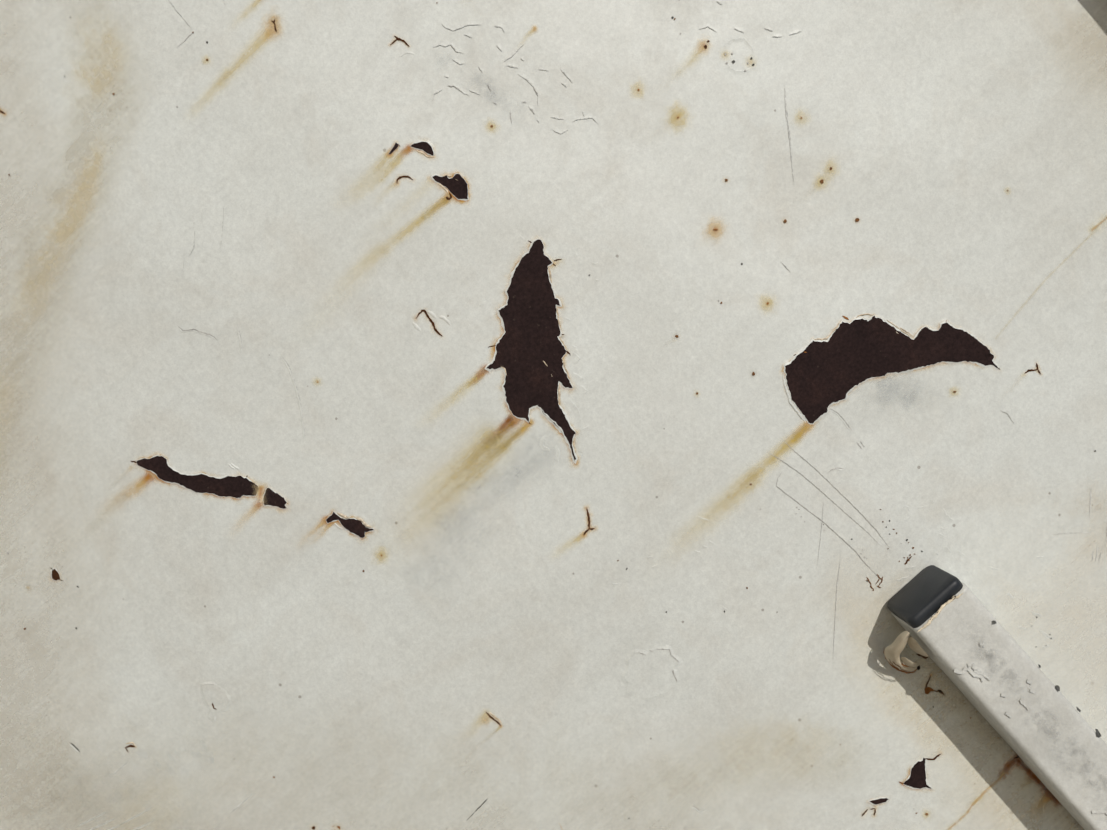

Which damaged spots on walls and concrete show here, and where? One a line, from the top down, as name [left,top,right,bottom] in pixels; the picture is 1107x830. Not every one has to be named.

peeling [387,139,436,158]
peeling [430,172,471,203]
corrosion [403,194,452,235]
peeling [484,236,581,466]
peeling [781,312,1000,426]
corrosion [465,415,533,467]
corrosion [746,422,813,485]
peeling [131,452,289,512]
peeling [323,510,376,540]
peeling [899,754,941,791]